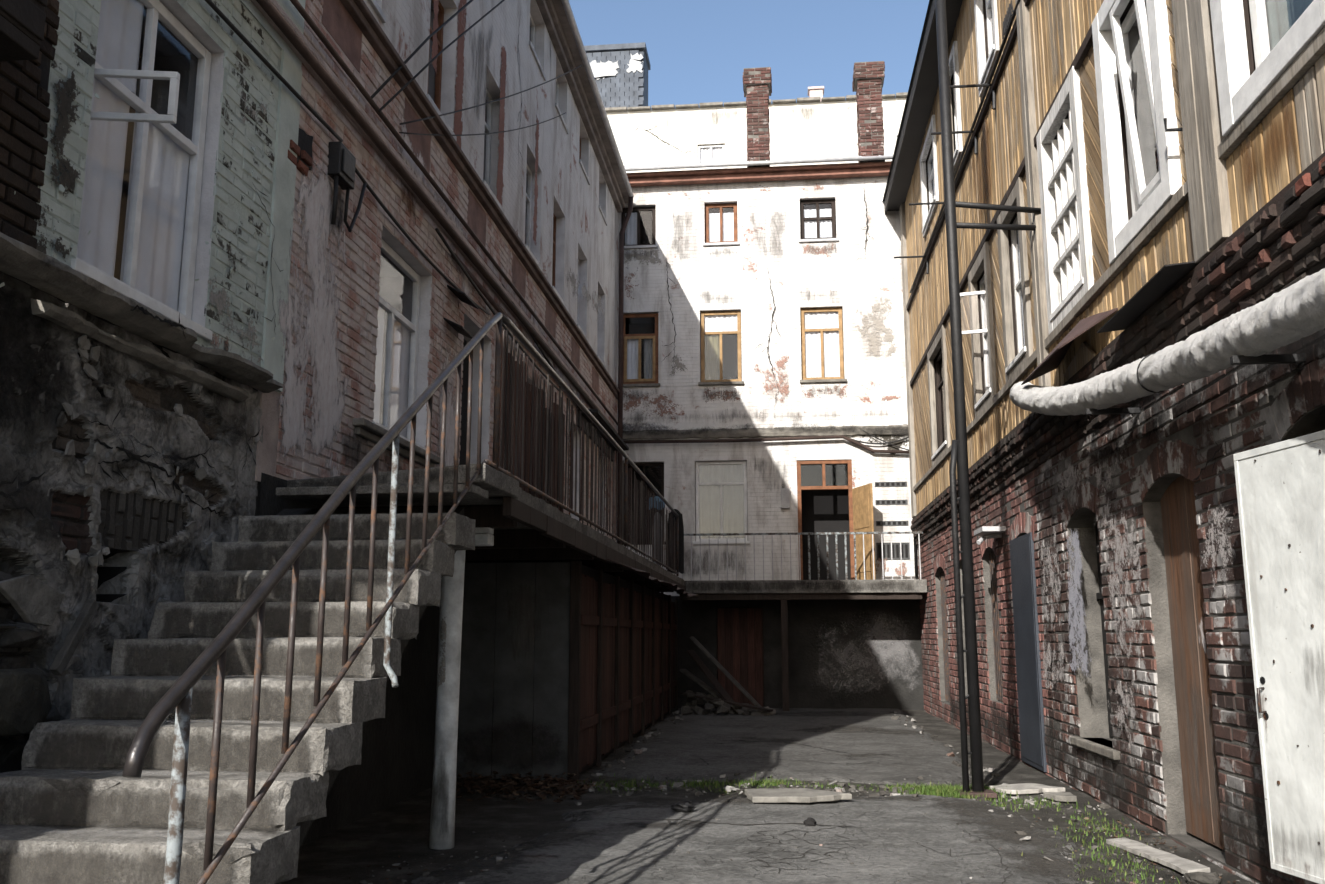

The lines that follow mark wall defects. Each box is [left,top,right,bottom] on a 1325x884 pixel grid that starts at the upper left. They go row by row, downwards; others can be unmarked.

peeling [40,70,100,197]
spalling [287,128,313,176]
peeling [34,200,72,262]
crack [856,190,879,261]
crack [754,267,780,408]
spalling [77,334,232,446]
spalling [623,390,908,457]
peeling [754,355,846,401]
spalling [51,402,237,567]
crack [547,814,1018,884]